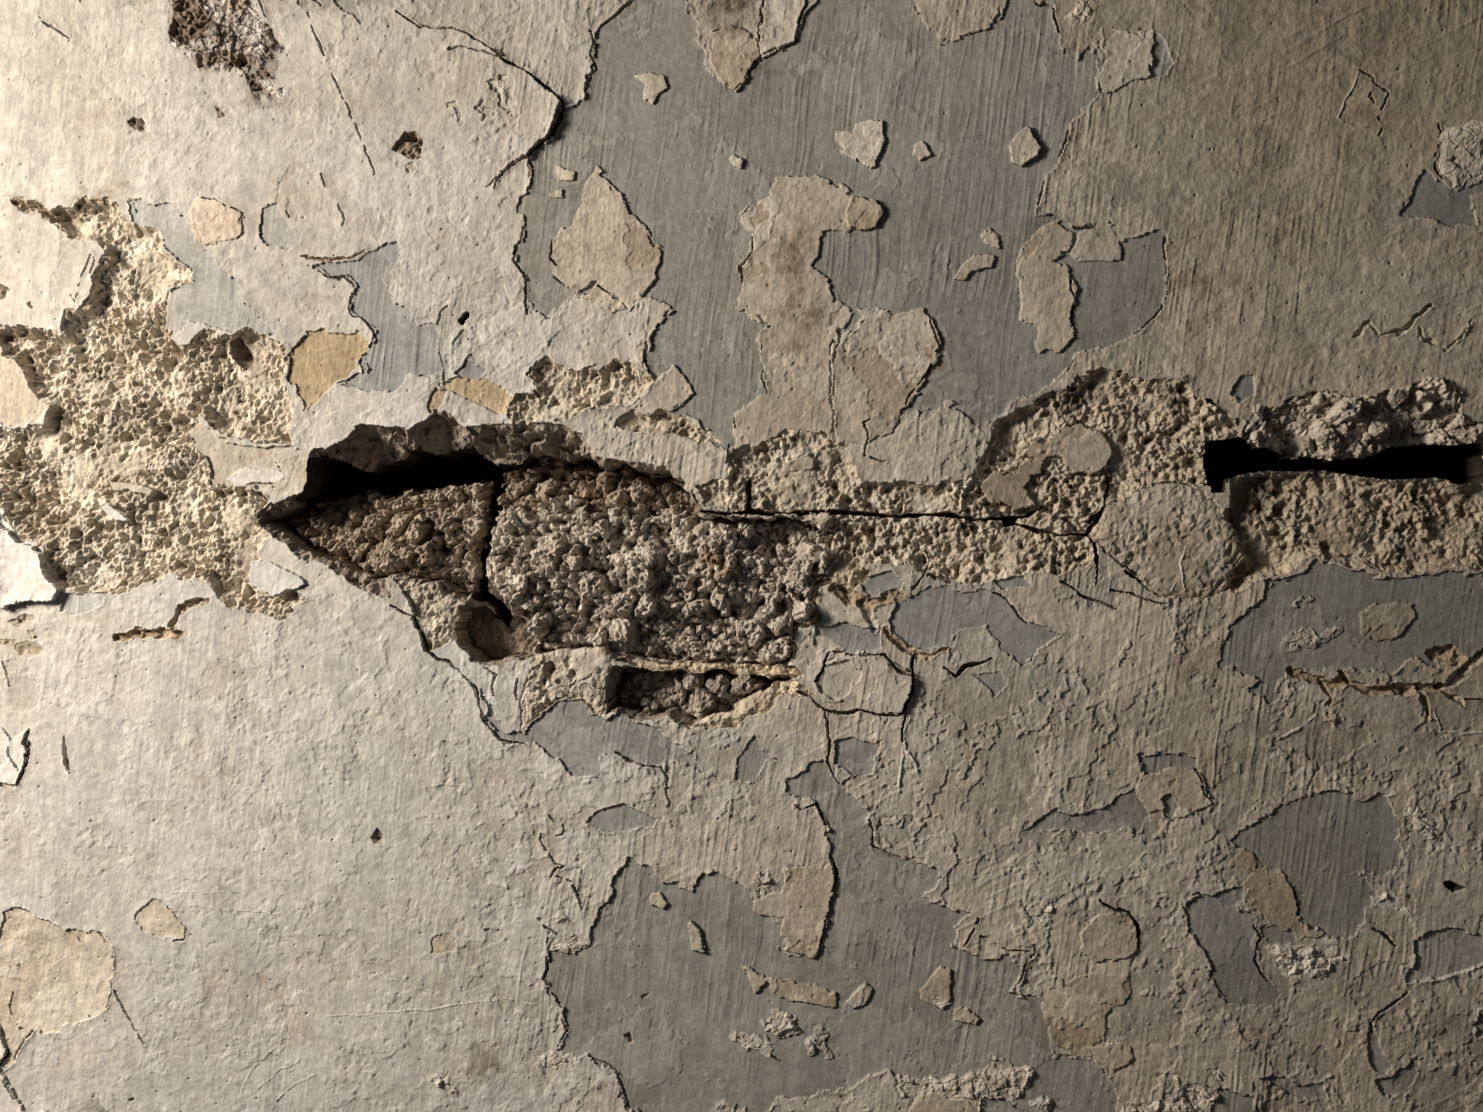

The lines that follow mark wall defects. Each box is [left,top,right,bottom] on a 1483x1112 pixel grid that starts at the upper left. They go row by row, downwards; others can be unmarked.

peeling [0,0,1483,779]
crack [702,420,1166,610]
crack [993,591,1027,623]
crack [8,730,31,783]
peeling [0,907,114,1066]
peeling [538,735,1260,1112]
peeling [1260,1076,1328,1100]
peeling [1181,789,1446,1007]
peeling [1367,1019,1419,1098]